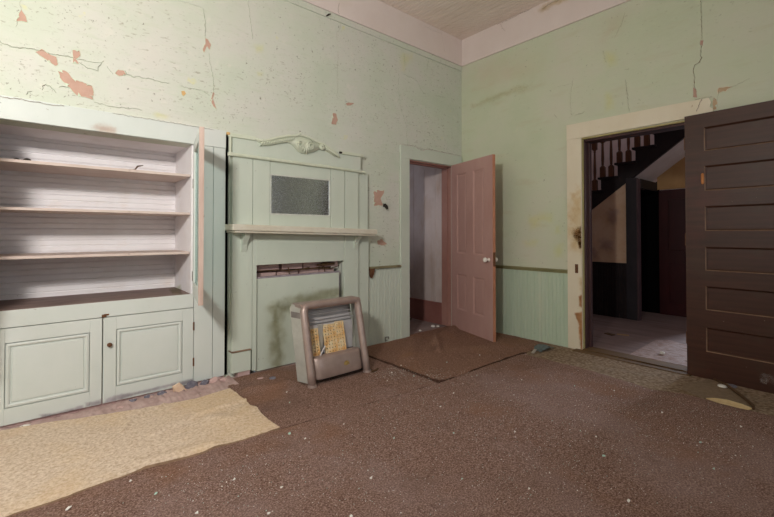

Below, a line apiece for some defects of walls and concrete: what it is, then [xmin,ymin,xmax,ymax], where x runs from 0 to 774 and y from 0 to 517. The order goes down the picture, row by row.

crack [0,84,68,106]
peeling [35,49,94,100]
crack [0,2,214,96]
crack [693,1,705,111]